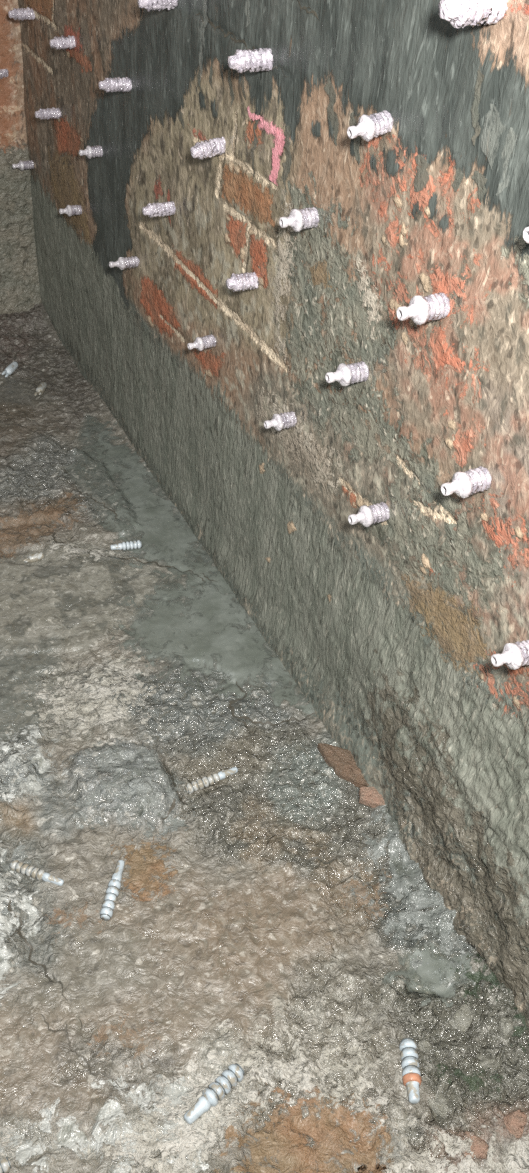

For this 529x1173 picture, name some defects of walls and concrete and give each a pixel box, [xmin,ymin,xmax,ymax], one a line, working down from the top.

spalling [25,0,60,37]
spalling [221,161,275,288]
spalling [139,276,180,337]
spalling [173,249,218,309]
spalling [359,134,491,404]
spalling [191,348,224,377]
spalling [443,409,486,468]
spalling [420,554,434,575]
spalling [474,492,529,587]
spalling [473,649,529,716]
rust [213,1082,395,1173]